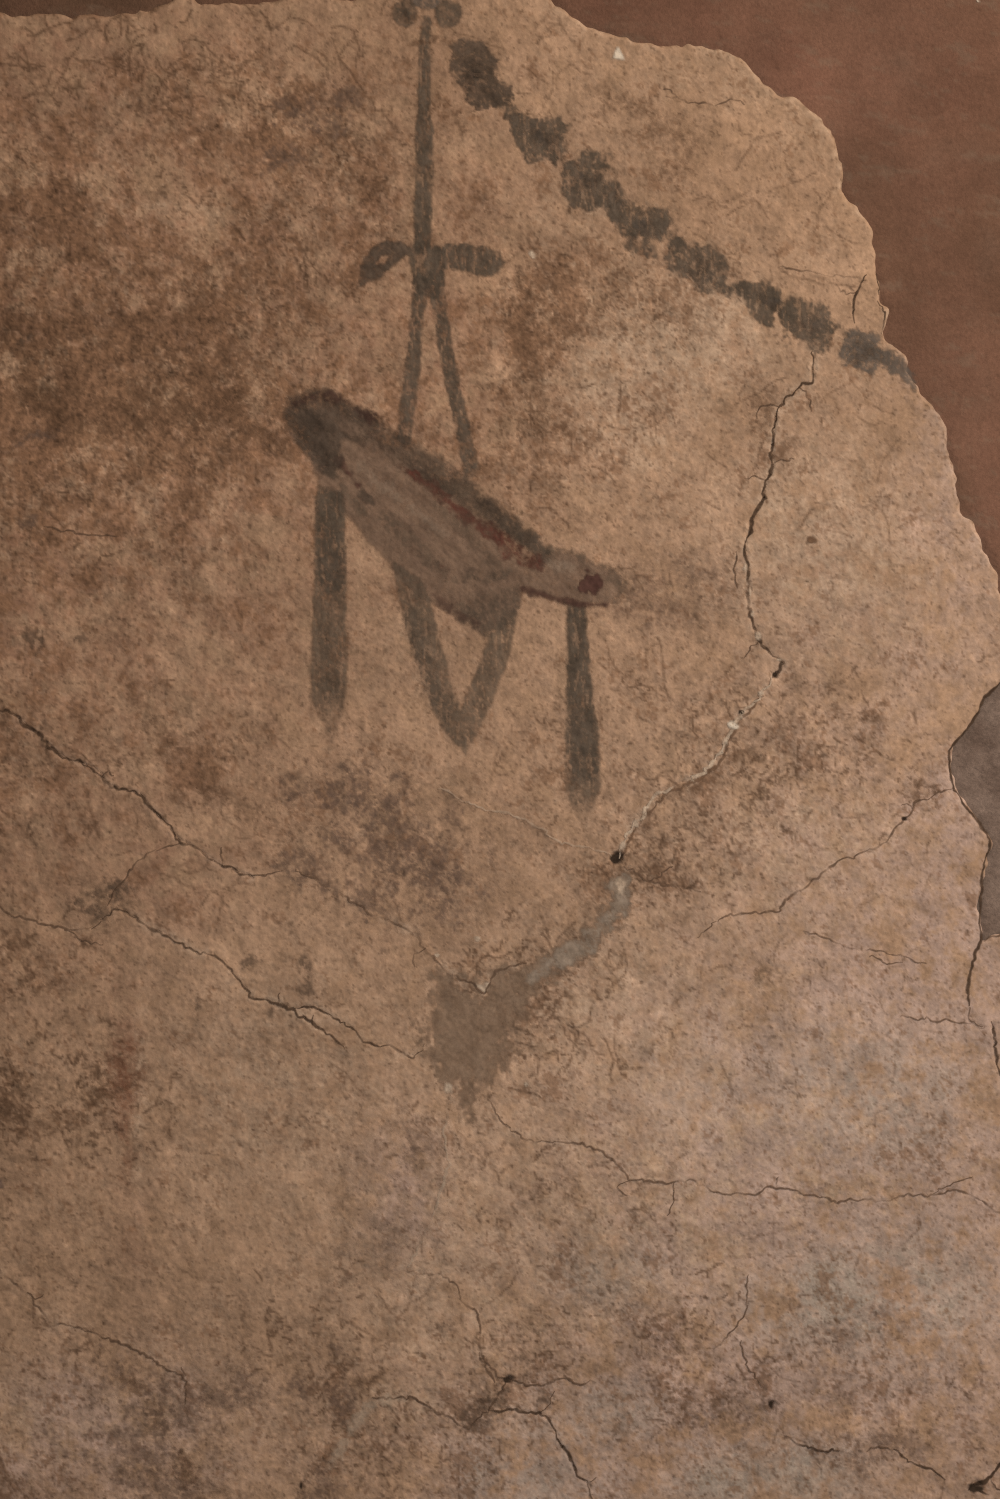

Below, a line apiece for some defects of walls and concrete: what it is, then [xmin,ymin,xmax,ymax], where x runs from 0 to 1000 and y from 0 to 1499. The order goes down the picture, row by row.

crack [733,352,814,677]
crack [0,709,183,847]
crack [220,847,316,879]
crack [624,866,692,888]
crack [697,683,1000,1074]
crack [0,868,419,1058]
crack [347,896,525,994]
crack [494,1108,863,1216]
crack [910,1177,988,1205]
crack [12,1281,188,1403]
crack [372,1280,593,1499]